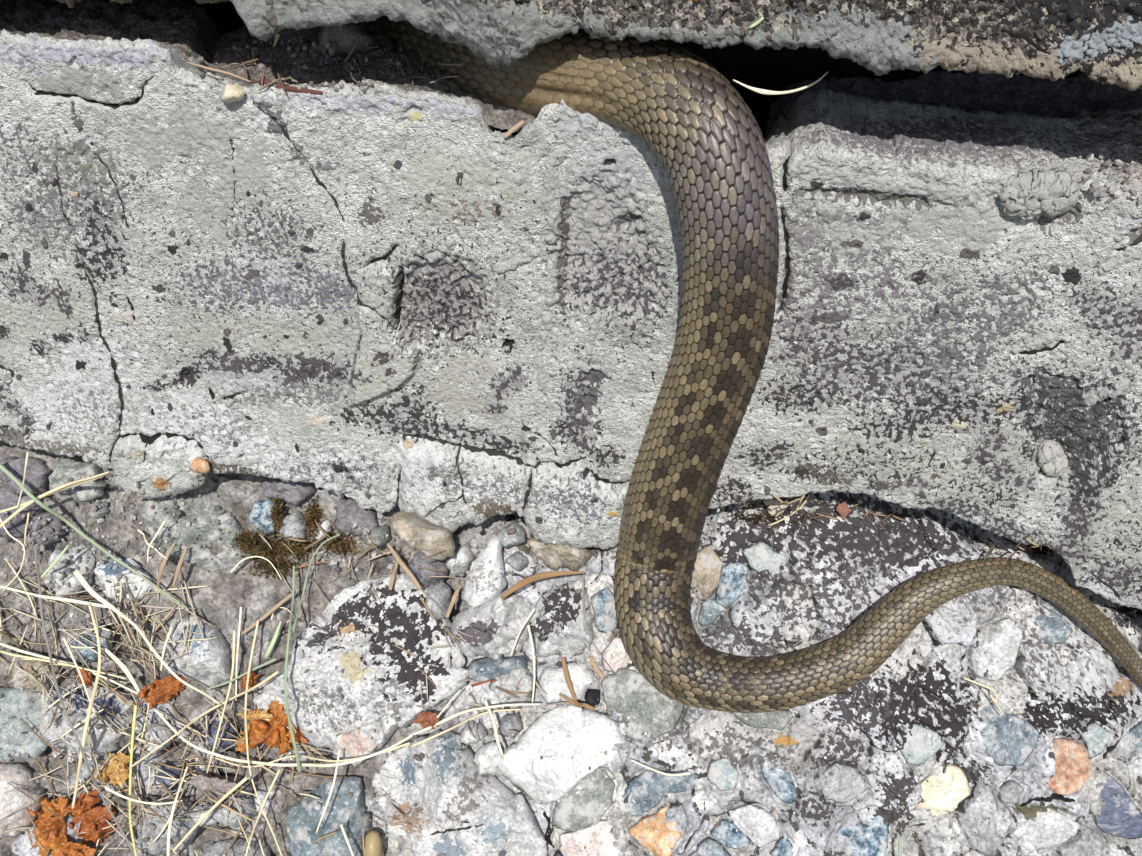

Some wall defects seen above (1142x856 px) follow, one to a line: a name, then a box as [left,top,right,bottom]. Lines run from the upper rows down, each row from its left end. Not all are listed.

crack [29,76,154,109]
crack [1001,28,1048,54]
crack [1084,63,1094,77]
crack [56,166,74,229]
crack [97,156,129,227]
crack [229,138,237,205]
crack [253,100,405,327]
crack [55,265,209,463]
crack [208,387,249,404]
crack [394,470,402,505]